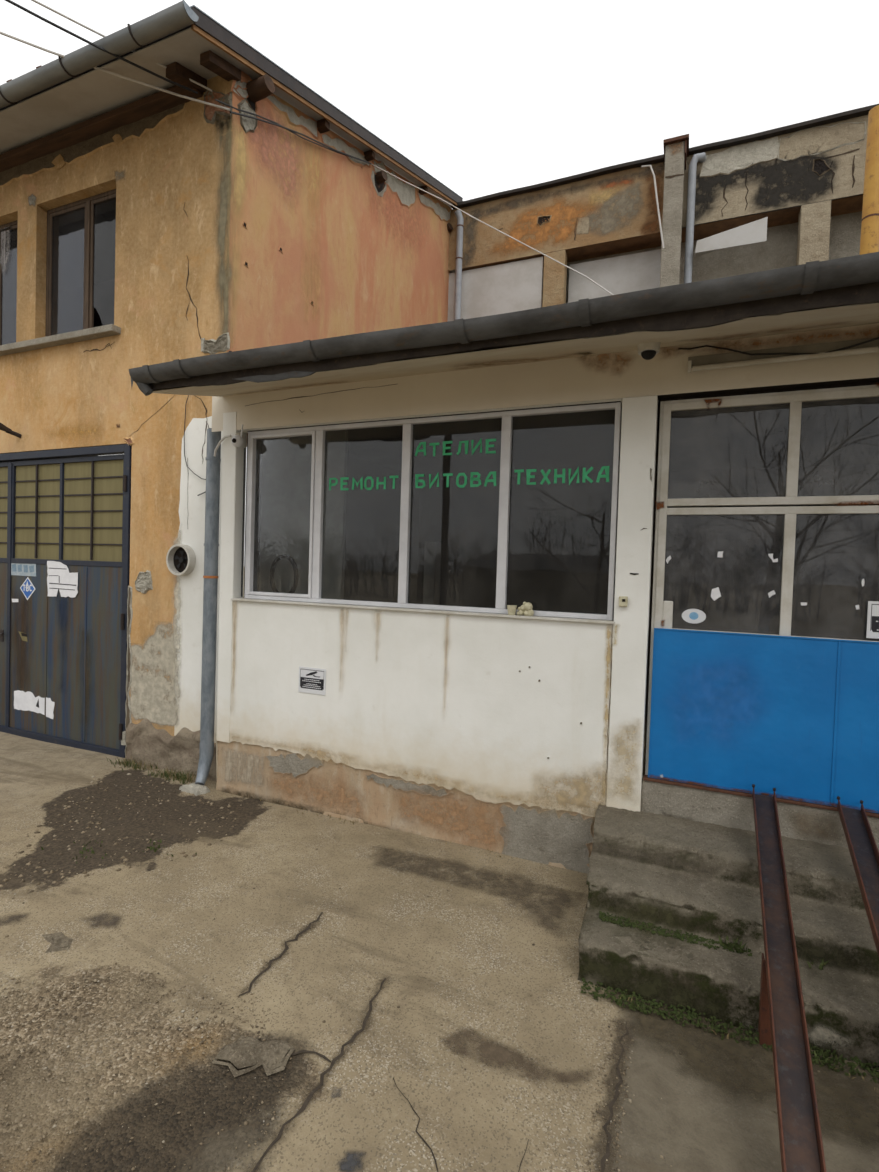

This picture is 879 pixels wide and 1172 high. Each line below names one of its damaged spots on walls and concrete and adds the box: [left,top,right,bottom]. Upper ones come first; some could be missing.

flaking render [266,753,323,778]
flaking render [366,773,455,797]